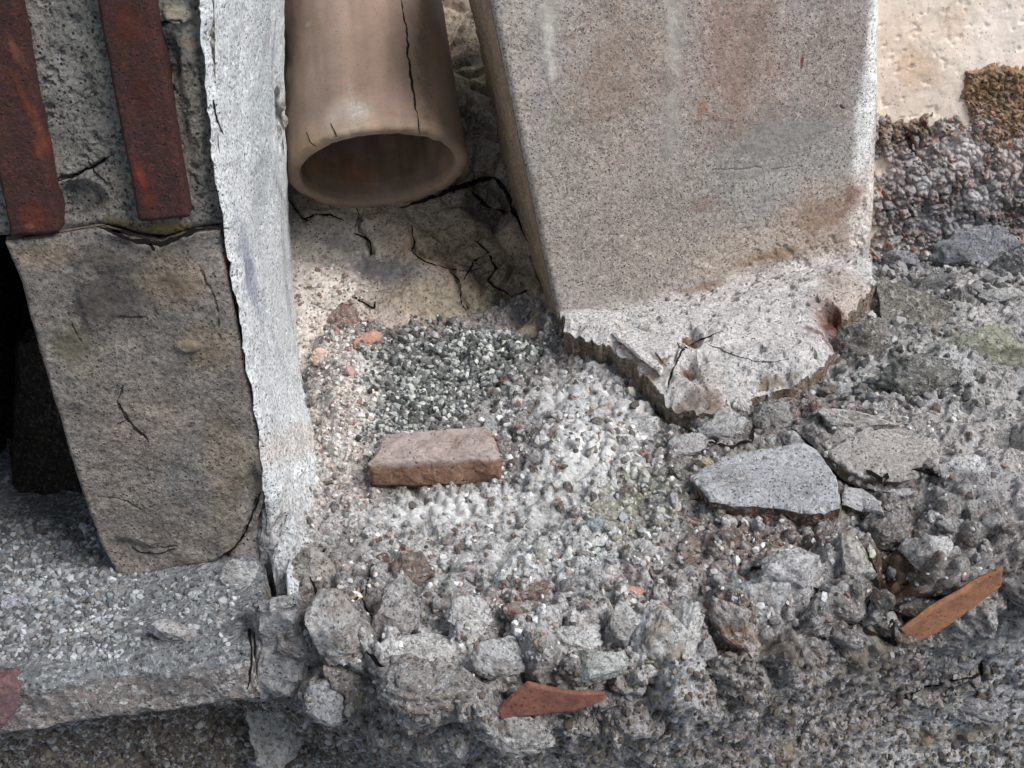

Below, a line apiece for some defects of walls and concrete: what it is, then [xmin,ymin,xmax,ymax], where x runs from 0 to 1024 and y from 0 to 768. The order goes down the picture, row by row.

crack [401,0,420,133]
crack [97,225,229,251]
crack [288,197,372,257]
crack [400,176,527,310]
crack [352,295,376,309]
flaking render [611,328,669,379]
spalling [674,370,722,414]
crack [655,331,789,388]
spalling [759,376,792,391]
spalling [810,311,842,342]
crack [220,492,261,558]
crack [246,628,254,690]